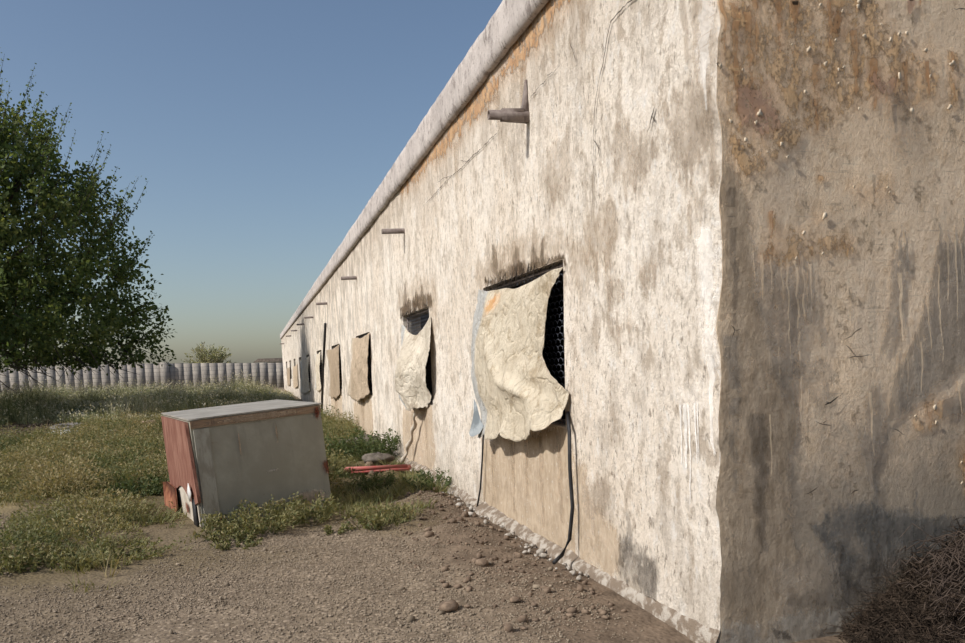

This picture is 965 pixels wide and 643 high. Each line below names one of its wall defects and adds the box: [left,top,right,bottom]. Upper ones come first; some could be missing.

crack [426,130,499,203]
crack [591,0,632,223]
peeling [716,0,932,177]
water stain [512,240,544,272]
water stain [667,83,965,643]